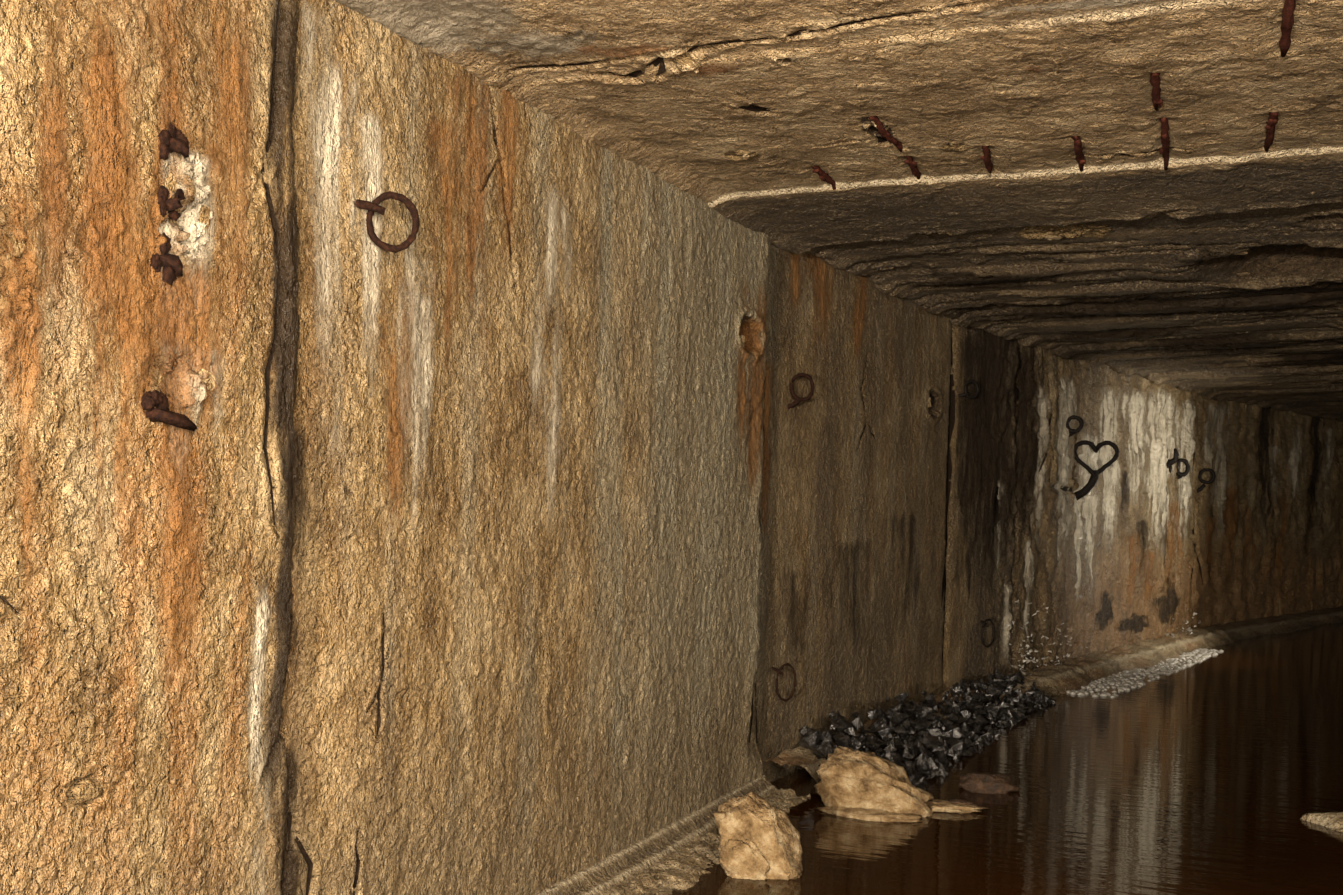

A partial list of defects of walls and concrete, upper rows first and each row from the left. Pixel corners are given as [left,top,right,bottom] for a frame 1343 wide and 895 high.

corrosion [1279,0,1296,57]
corrosion [216,30,249,208]
corrosion [1150,73,1170,170]
corrosion [1264,112,1279,152]
corrosion [0,93,69,420]
spalling [155,150,213,275]
corrosion [84,24,218,665]
spalling [148,350,175,407]
spalling [186,369,219,413]
damp [923,274,1343,656]